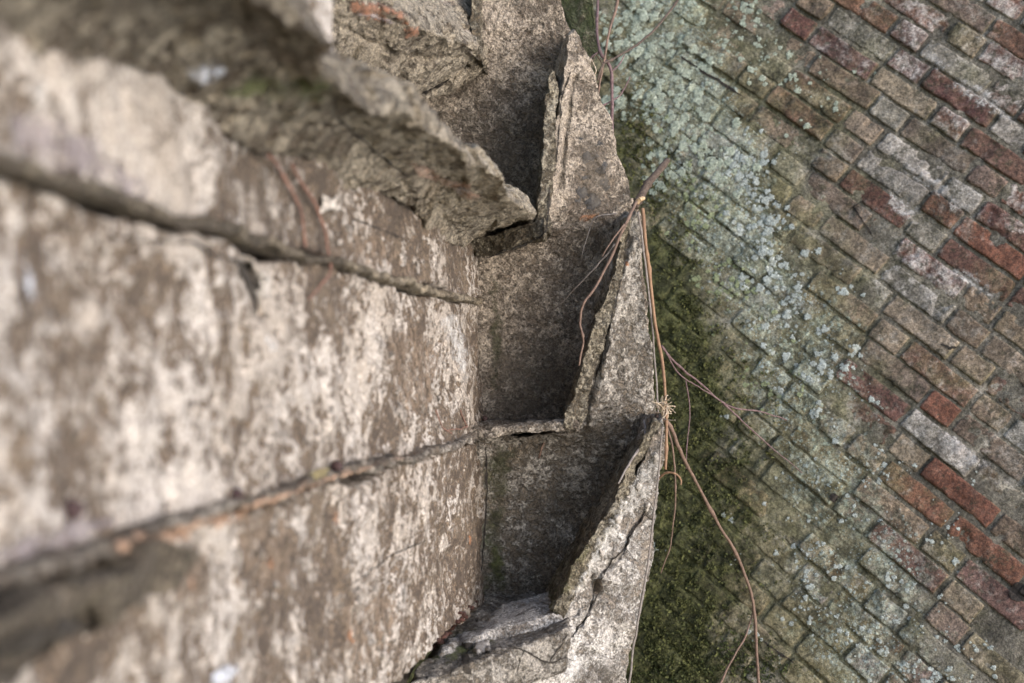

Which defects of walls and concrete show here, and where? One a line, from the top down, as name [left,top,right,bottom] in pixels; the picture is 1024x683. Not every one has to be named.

crack [514,512,652,673]